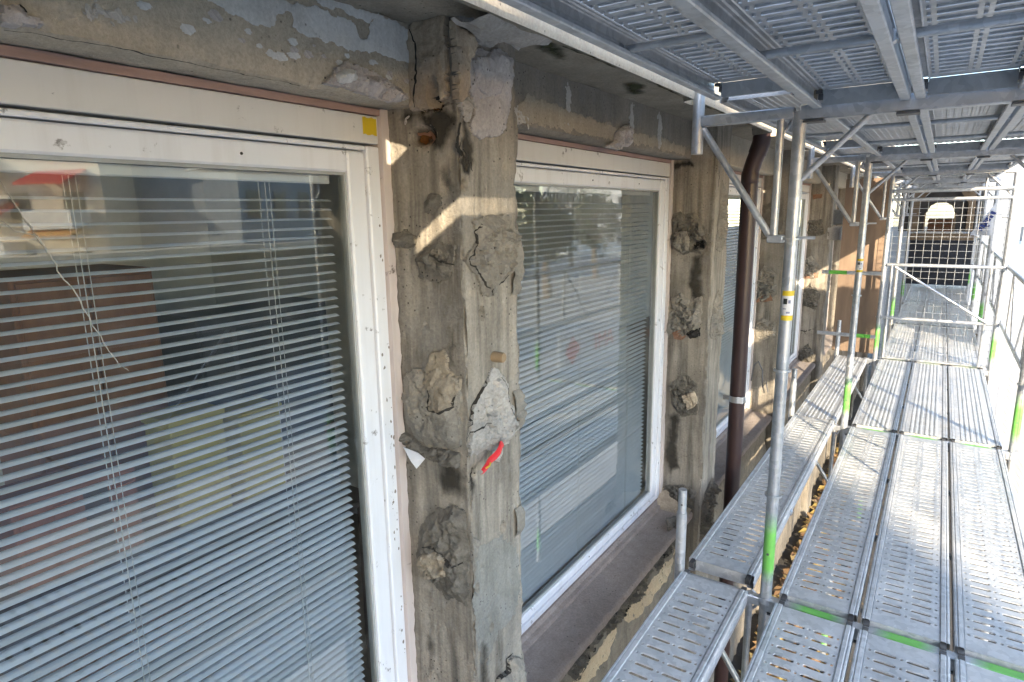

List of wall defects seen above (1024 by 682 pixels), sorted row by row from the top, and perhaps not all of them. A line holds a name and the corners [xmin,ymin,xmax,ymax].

spalling [0,4,44,29]
peeling [180,0,552,112]
rust [418,131,437,145]
peeling [517,93,688,156]